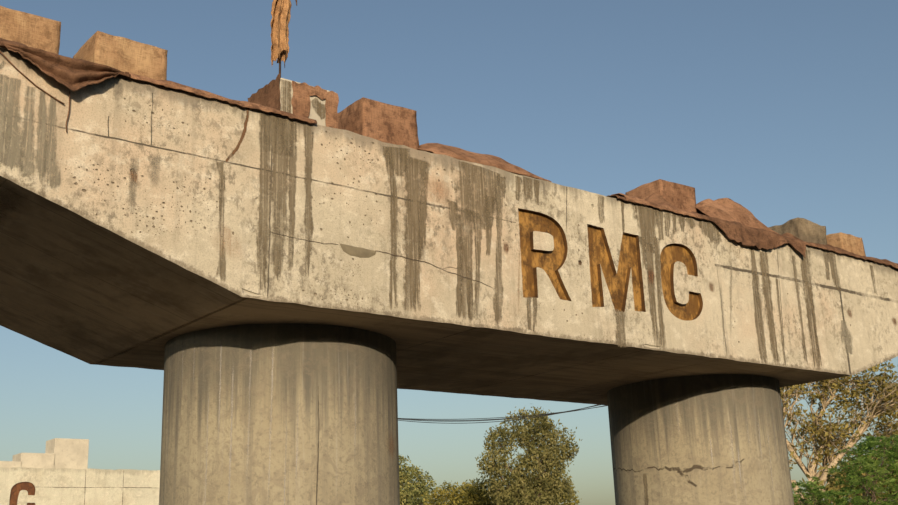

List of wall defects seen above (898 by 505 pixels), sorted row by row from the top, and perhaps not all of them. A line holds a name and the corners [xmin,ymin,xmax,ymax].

water stain [0,61,60,187]
crack [225,108,249,162]
water stain [256,80,313,288]
water stain [383,146,429,310]
crack [375,250,492,288]
water stain [449,161,539,324]
water stain [751,249,785,362]
water stain [792,250,822,368]
water stain [824,252,841,291]
water stain [841,320,852,354]
crack [614,459,744,487]